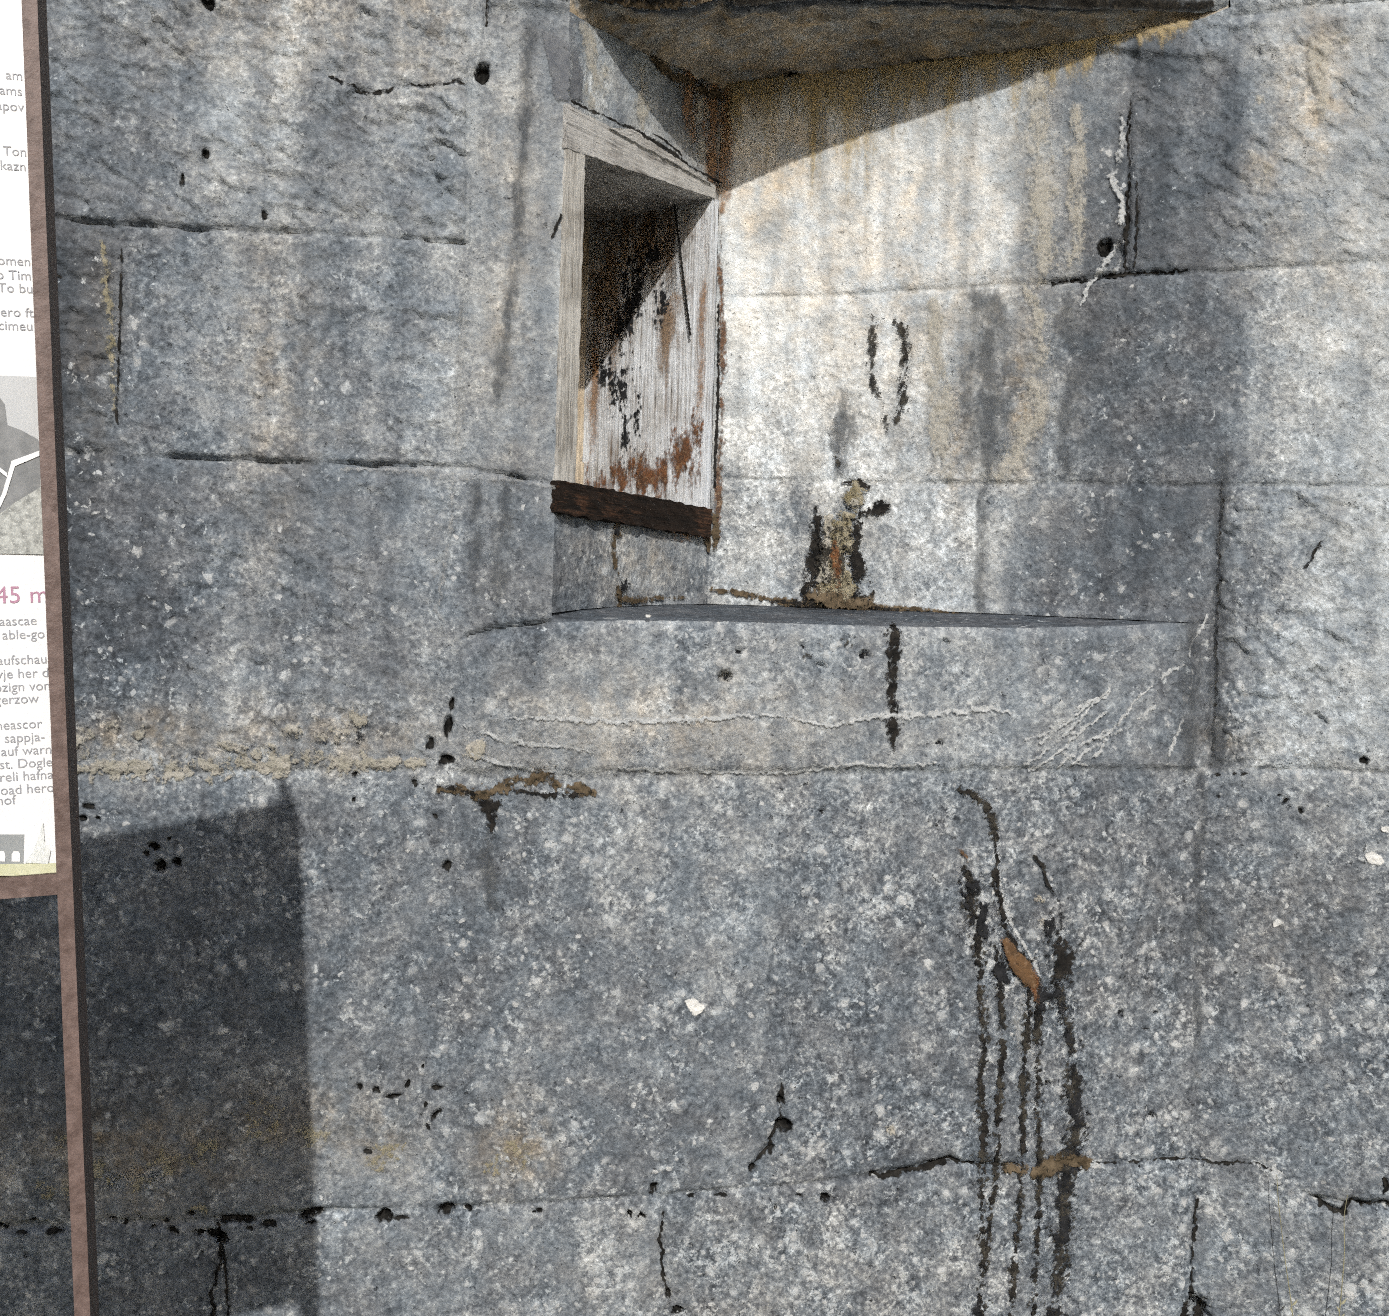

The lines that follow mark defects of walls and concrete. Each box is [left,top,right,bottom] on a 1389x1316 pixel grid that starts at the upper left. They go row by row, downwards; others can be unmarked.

crack [328,75,465,95]
damp [729,0,1214,610]
corrosion [585,232,728,553]
damp [463,399,1012,774]
damp [1183,721,1229,844]
damp [437,785,592,911]
damp [955,784,1097,1316]
damp [1194,996,1202,1049]
crack [754,1082,784,1162]
crack [209,1222,229,1316]
crack [1183,1198,1199,1305]
crack [1314,1177,1389,1216]